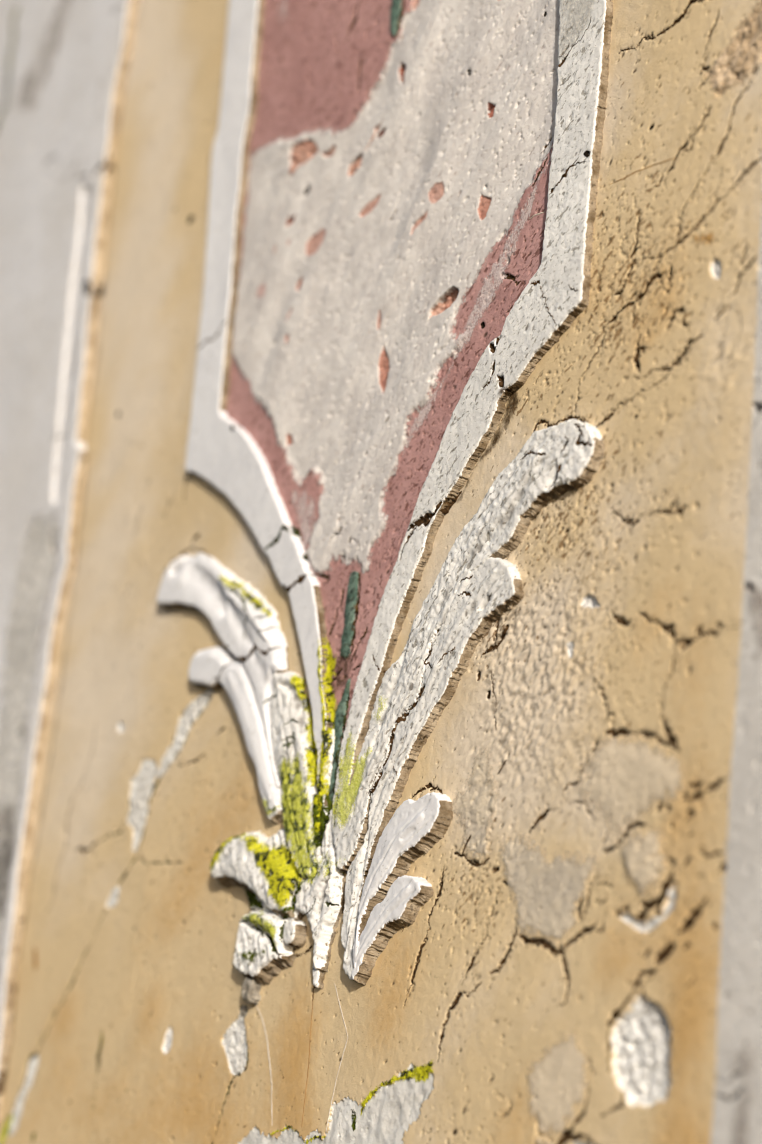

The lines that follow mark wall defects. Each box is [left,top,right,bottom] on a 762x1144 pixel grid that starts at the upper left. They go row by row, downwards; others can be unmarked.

spalling [289,140,336,175]
crack [521,0,762,488]
spalling [378,346,390,393]
crack [613,497,699,527]
leakage [329,655,352,694]
crack [46,524,351,913]
peeling [127,690,214,851]
crack [405,611,738,1144]
crack [239,891,339,958]
peeling [222,1005,248,1075]
spalling [611,989,672,1109]
peeling [238,1063,434,1144]